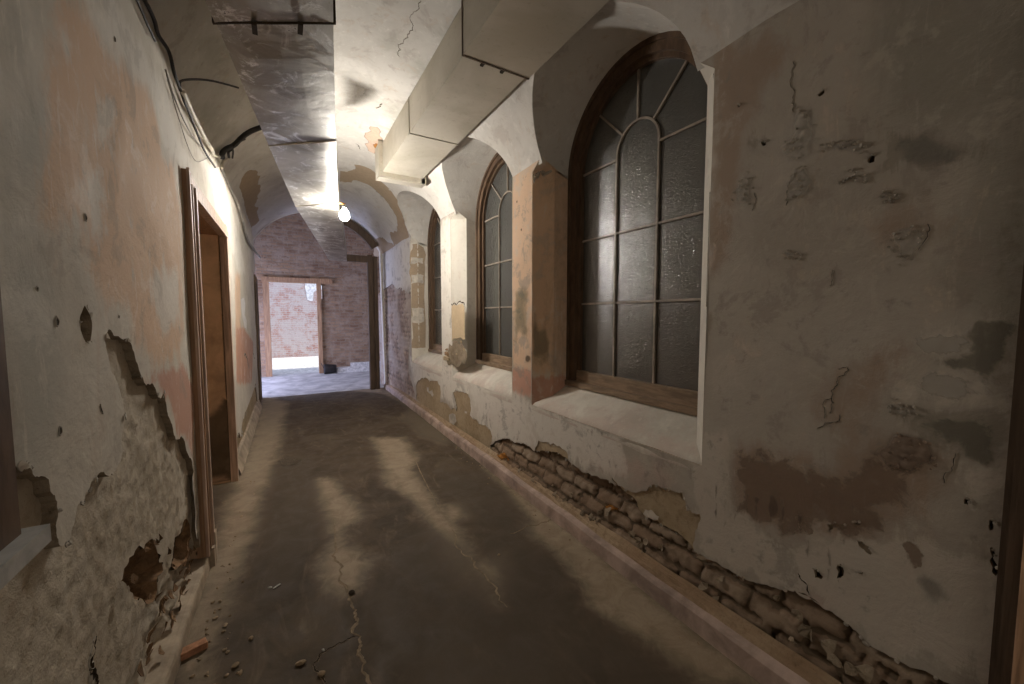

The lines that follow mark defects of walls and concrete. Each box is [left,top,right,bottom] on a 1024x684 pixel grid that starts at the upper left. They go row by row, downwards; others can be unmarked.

crack [397,0,421,57]
peeling [364,127,382,153]
peeling [239,170,261,227]
flaking render [340,165,949,684]
crack [817,367,849,429]
spalling [0,333,198,684]
crack [312,520,372,684]